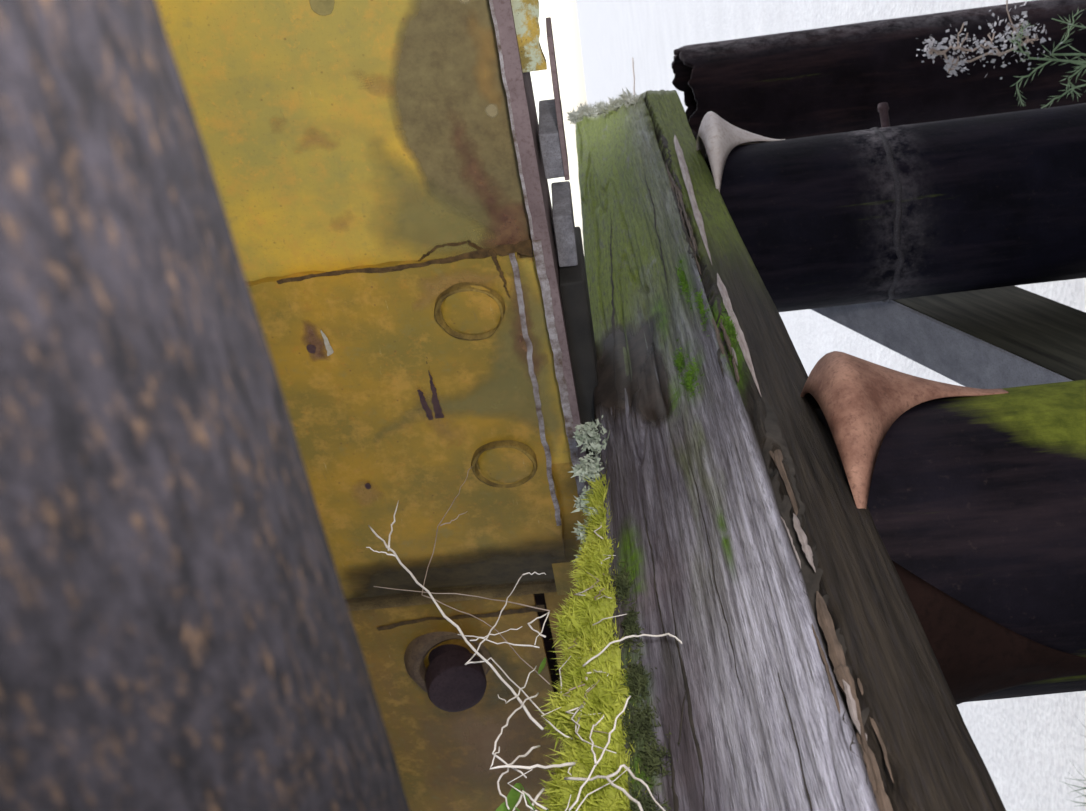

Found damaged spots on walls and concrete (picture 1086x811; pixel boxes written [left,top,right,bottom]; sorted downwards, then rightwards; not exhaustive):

water stain [394,0,531,252]